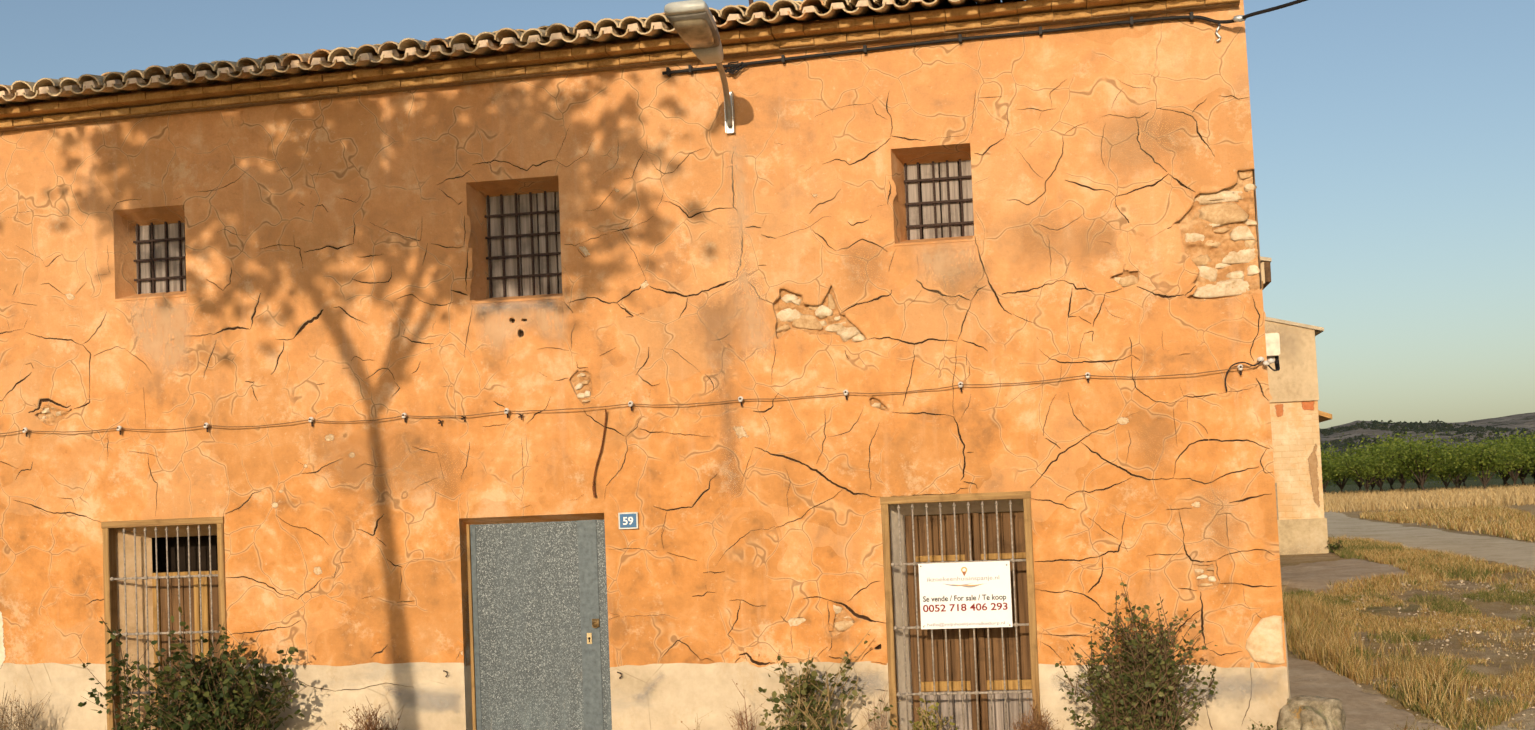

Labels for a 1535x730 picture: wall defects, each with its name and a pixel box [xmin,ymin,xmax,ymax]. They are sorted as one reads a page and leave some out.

spalling [1175,170,1260,301]
spalling [774,287,866,343]
spalling [570,371,592,408]
crack [0,66,1277,730]